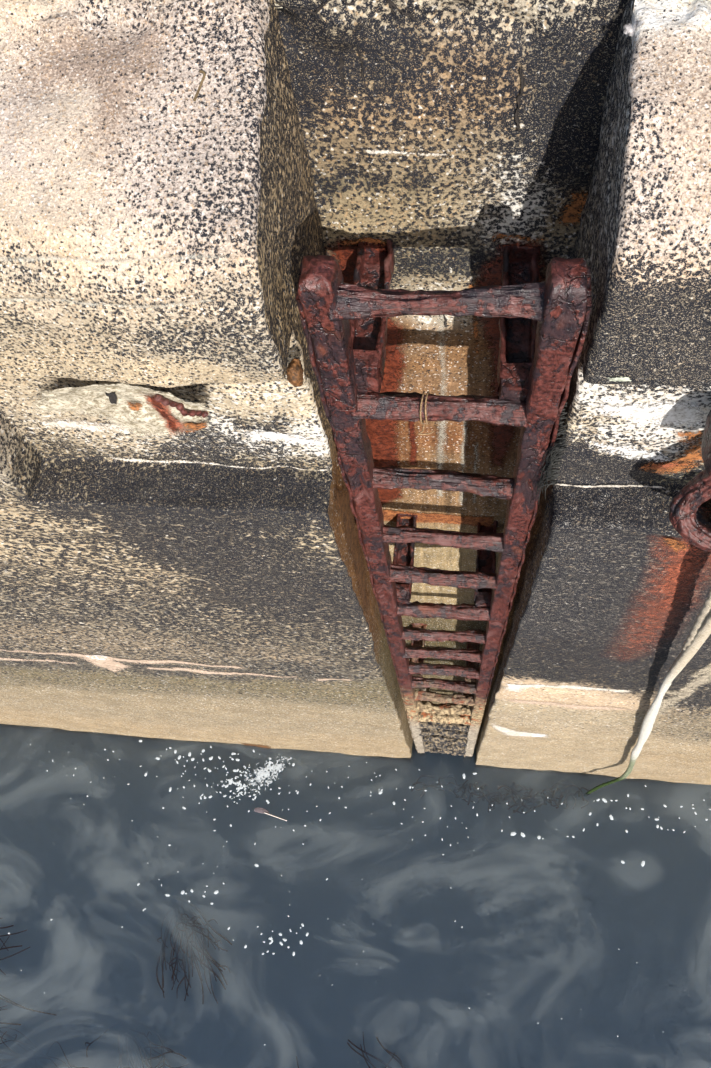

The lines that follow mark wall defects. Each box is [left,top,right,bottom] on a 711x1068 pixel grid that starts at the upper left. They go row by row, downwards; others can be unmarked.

damp [42,420,162,434]
damp [240,429,327,446]
damp [596,402,704,427]
damp [586,441,669,462]
rust [640,431,703,474]
rust [631,538,711,642]
damp [504,684,633,710]